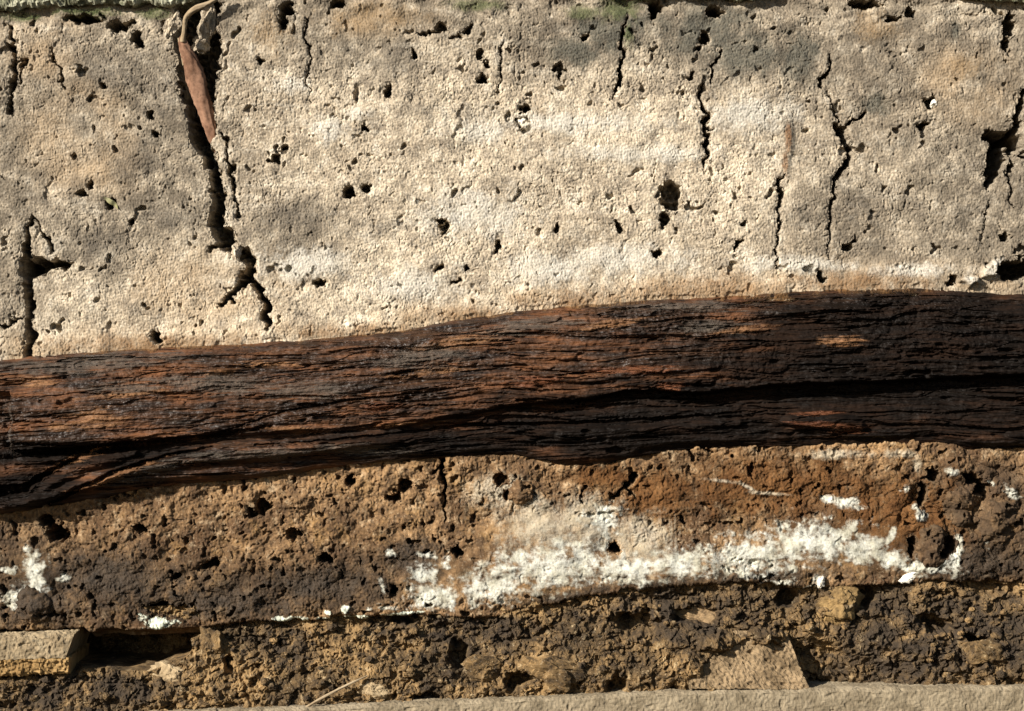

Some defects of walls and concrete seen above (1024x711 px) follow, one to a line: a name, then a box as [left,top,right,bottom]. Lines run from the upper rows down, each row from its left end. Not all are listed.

crack [171,0,274,332]
crack [697,47,723,169]
crack [817,52,868,260]
crack [978,87,1024,245]
crack [0,214,74,358]
water stain [0,496,1024,630]